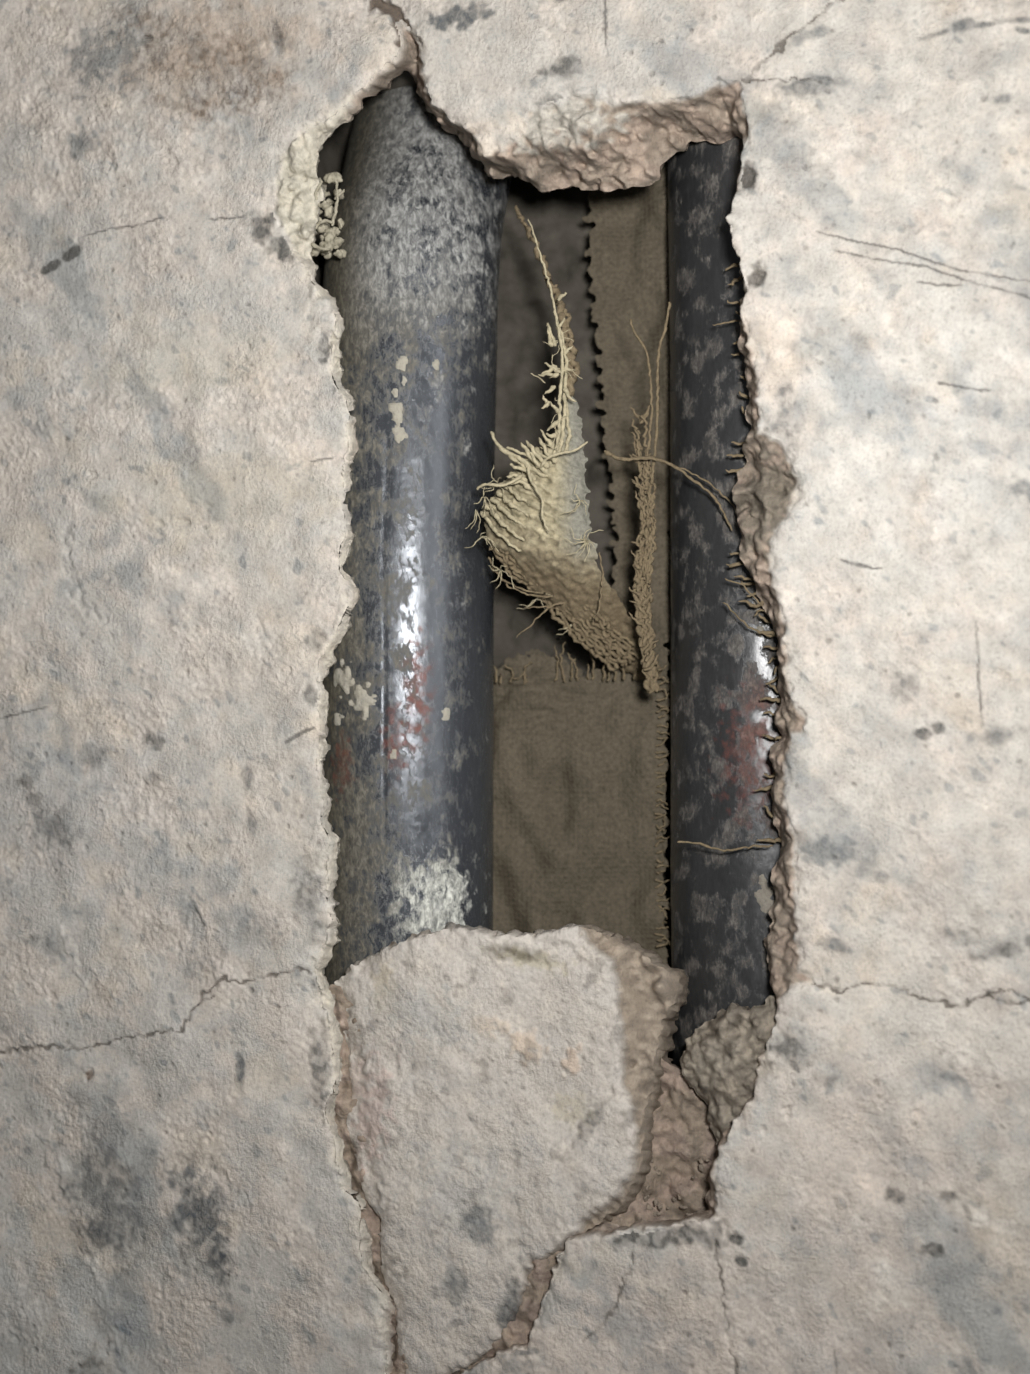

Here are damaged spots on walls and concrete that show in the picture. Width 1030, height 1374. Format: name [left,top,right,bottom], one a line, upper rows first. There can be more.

crack [370,0,420,47]
crack [741,0,843,83]
spalling [274,22,813,1374]
crack [93,968,309,1047]
crack [814,983,870,994]
crack [912,989,1030,1008]
crack [0,1044,55,1053]